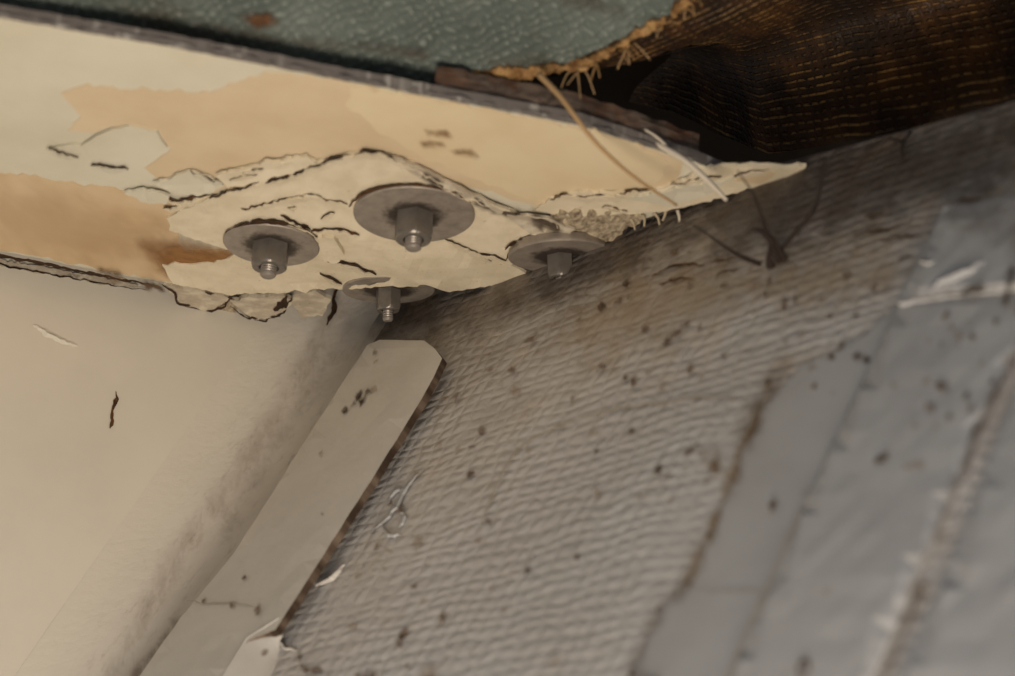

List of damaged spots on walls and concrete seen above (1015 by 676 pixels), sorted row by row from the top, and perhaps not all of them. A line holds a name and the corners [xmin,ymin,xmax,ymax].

peeling [0,72,806,320]
crack [0,254,292,322]
rust [148,244,233,271]
crack [163,150,485,325]
crack [445,239,521,263]